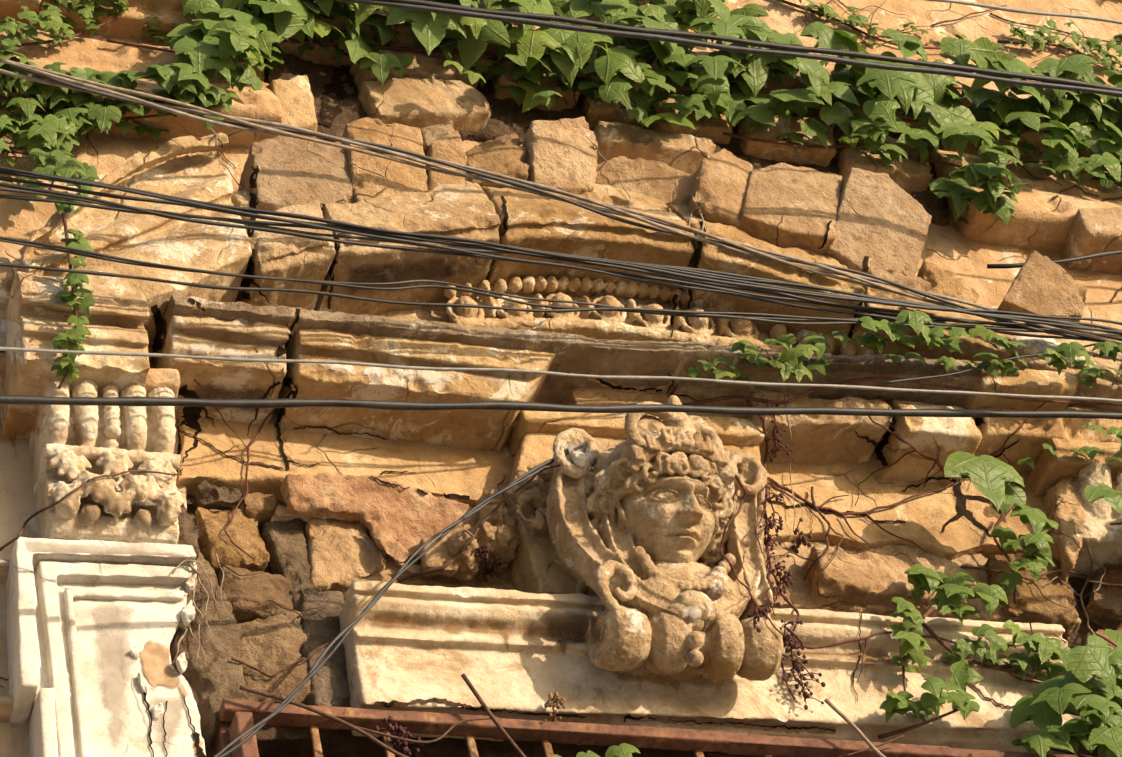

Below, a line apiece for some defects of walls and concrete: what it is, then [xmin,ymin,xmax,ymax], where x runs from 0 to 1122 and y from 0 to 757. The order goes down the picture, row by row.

crack [498,196,509,235]
crack [176,139,387,474]
crack [669,215,707,337]
crack [855,404,896,468]
crack [975,417,988,426]
crack [994,438,1020,458]
crack [345,470,470,500]
crack [771,500,905,533]
crack [901,470,1007,539]
flaking render [180,572,197,627]
flaking render [129,640,188,721]
crack [143,692,207,757]